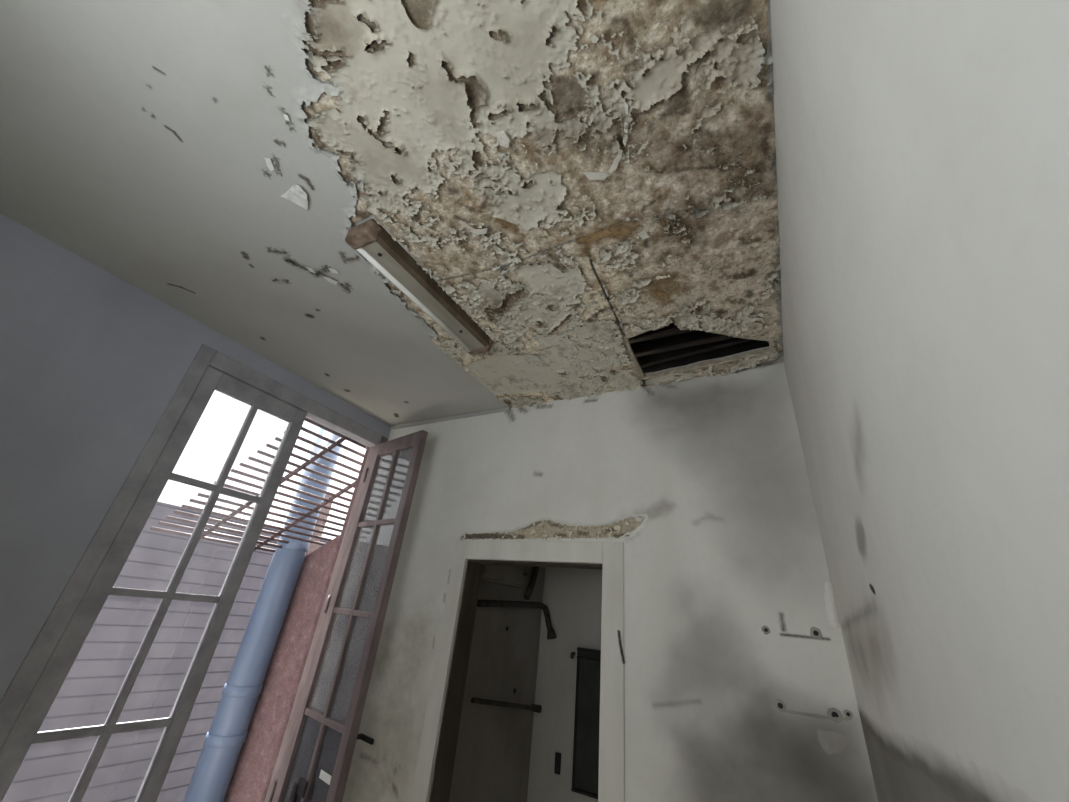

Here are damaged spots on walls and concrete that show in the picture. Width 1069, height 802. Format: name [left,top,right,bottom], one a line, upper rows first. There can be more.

peeling [265,157,282,177]
peeling [268,0,784,408]
spalling [458,513,649,542]